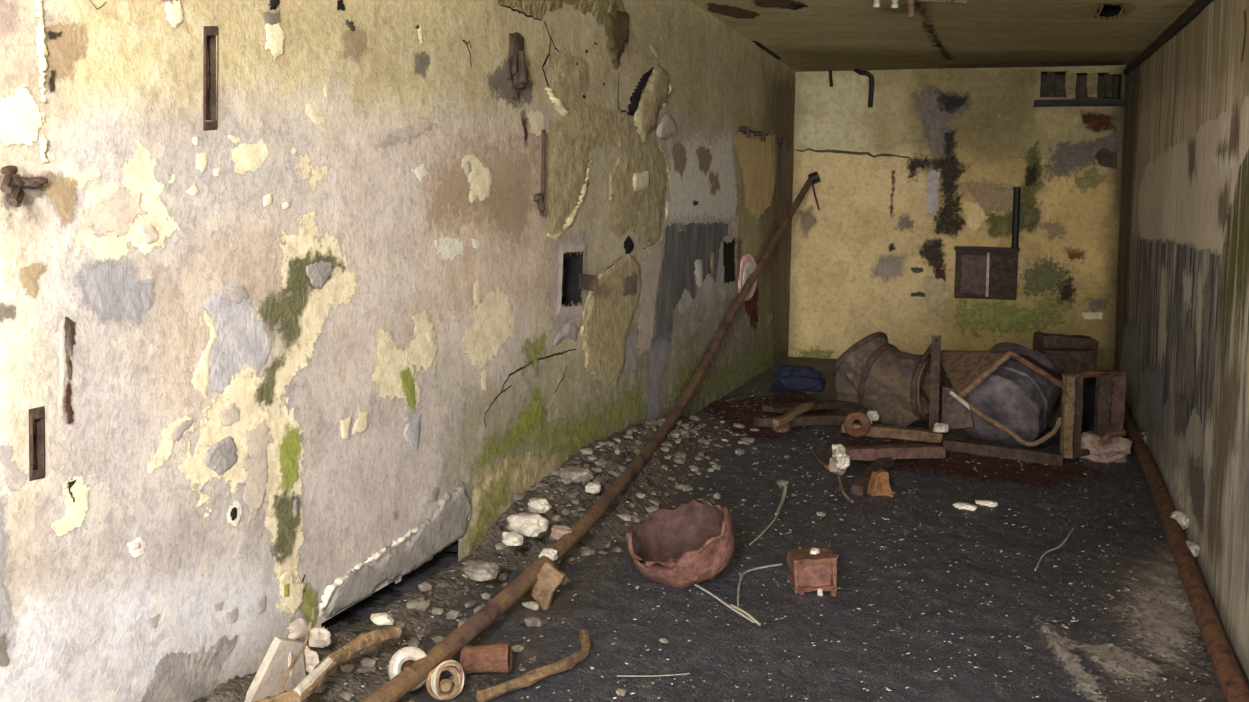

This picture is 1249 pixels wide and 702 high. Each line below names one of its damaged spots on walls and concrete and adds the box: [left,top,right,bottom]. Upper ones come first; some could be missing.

spalling [495,0,629,69]
spalling [706,0,808,19]
peeling [0,303,16,321]
peeling [18,263,46,297]
peeling [59,139,180,324]
flaking render [546,45,742,388]
water stain [907,1,1249,601]
flaking render [57,317,76,424]
peeling [147,145,577,642]
crack [484,349,576,428]
flaking render [140,602,238,702]
water stain [1042,561,1204,702]